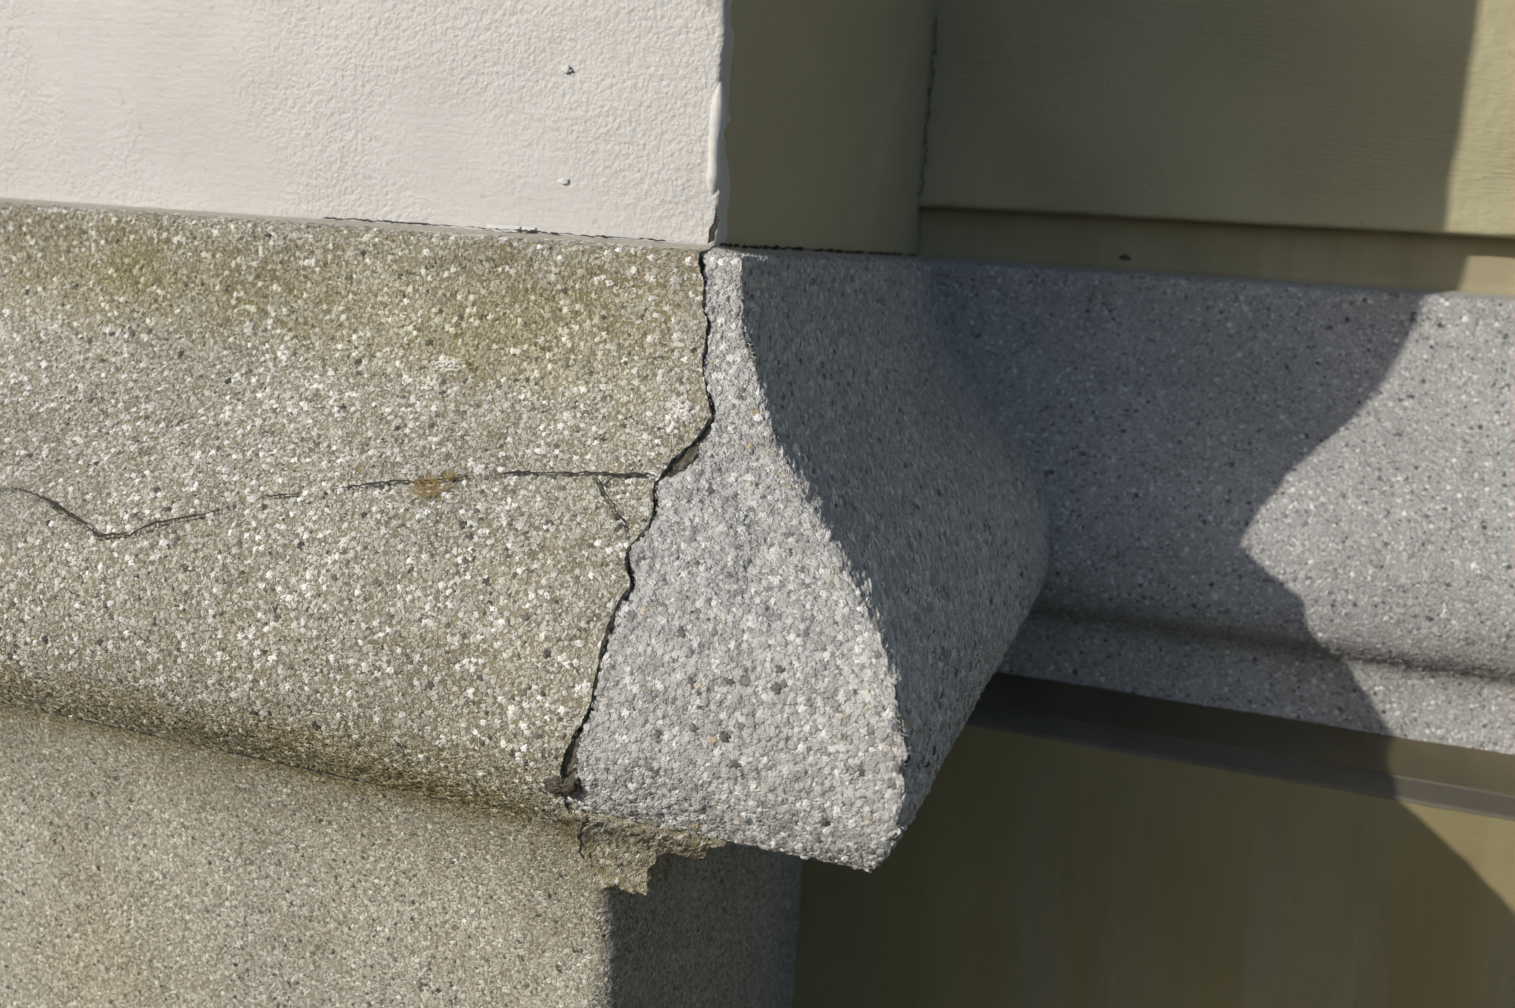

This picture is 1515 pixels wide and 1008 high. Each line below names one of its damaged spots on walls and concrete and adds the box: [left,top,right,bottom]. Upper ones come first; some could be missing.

crack [0,470,659,589]
crack [602,620,615,659]
spalling [542,732,729,896]